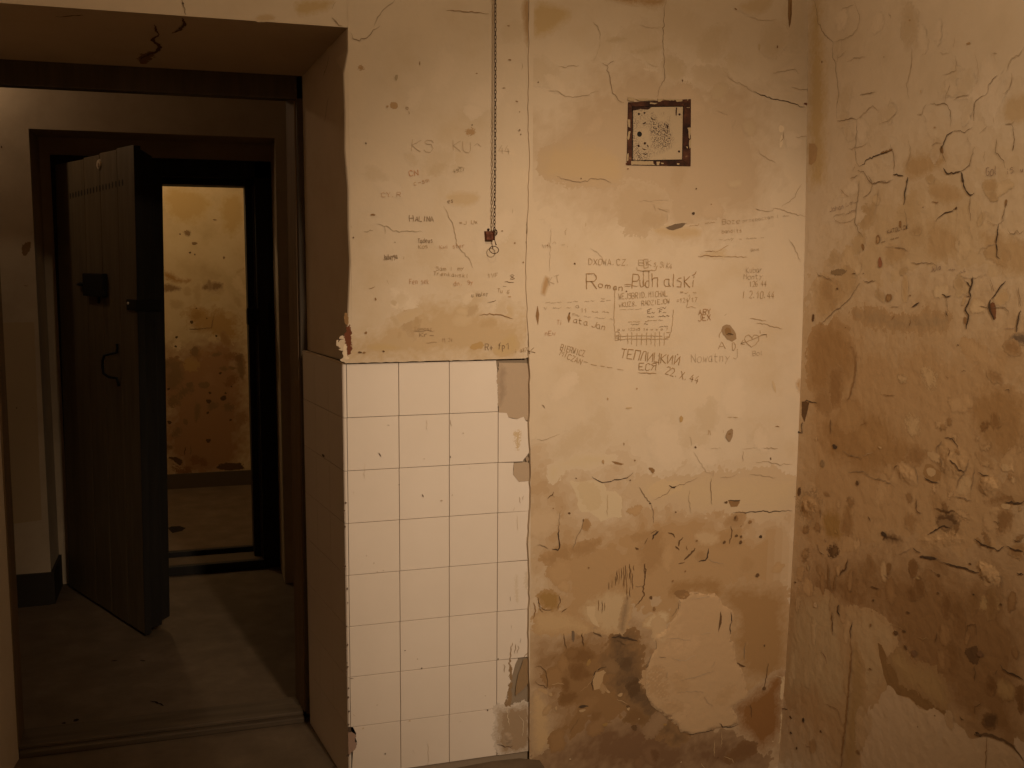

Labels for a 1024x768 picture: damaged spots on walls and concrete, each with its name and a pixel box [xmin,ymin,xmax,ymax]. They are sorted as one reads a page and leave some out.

crack [141,1,186,59]
crack [751,1,1023,332]
leakage [498,0,1024,768]
peeling [513,457,529,482]
crack [541,492,583,551]
crack [594,437,790,605]
peeling [485,658,557,755]